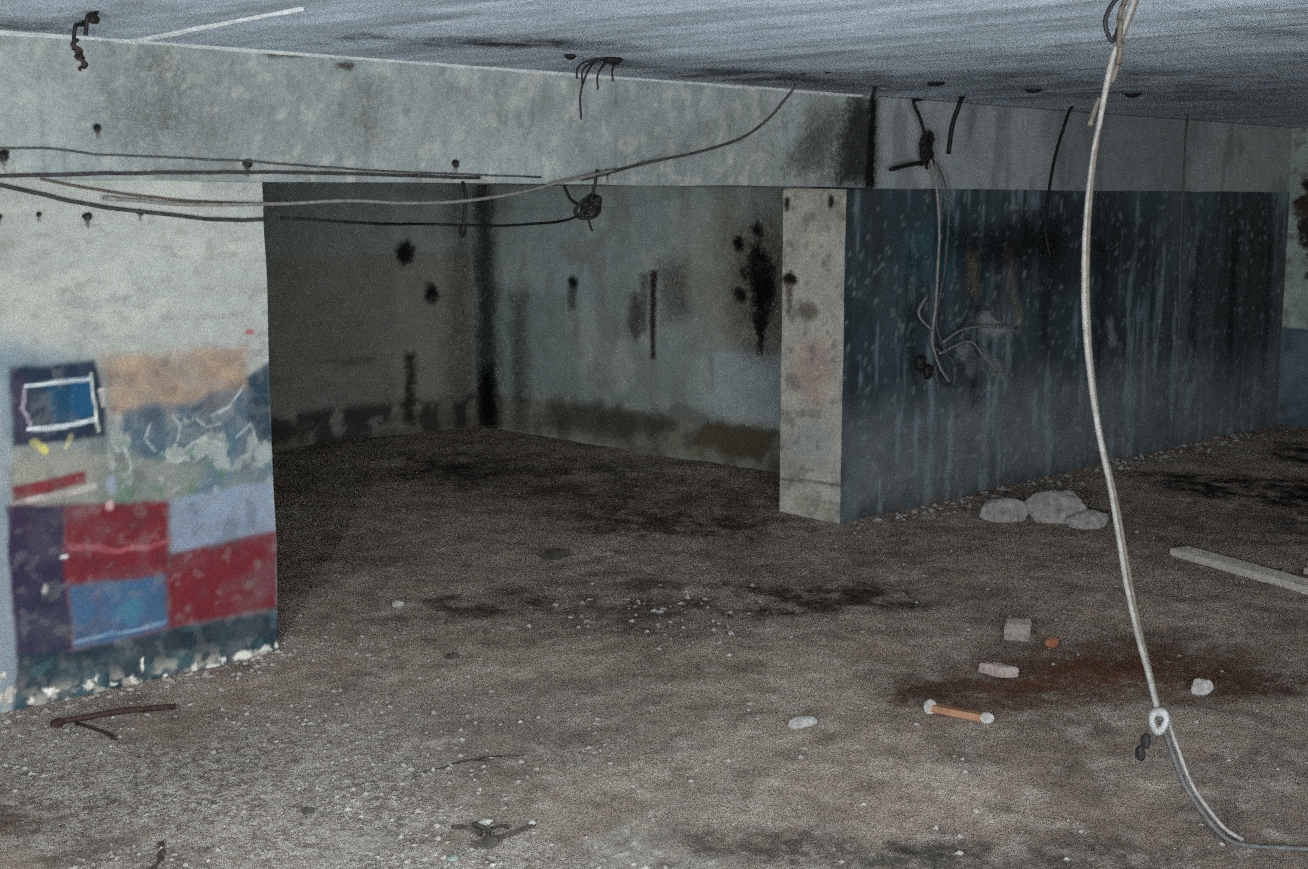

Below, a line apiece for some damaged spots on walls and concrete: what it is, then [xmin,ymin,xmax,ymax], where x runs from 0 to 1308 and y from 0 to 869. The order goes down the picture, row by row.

water stain [753,316,766,352]
crack [149,838,166,869]